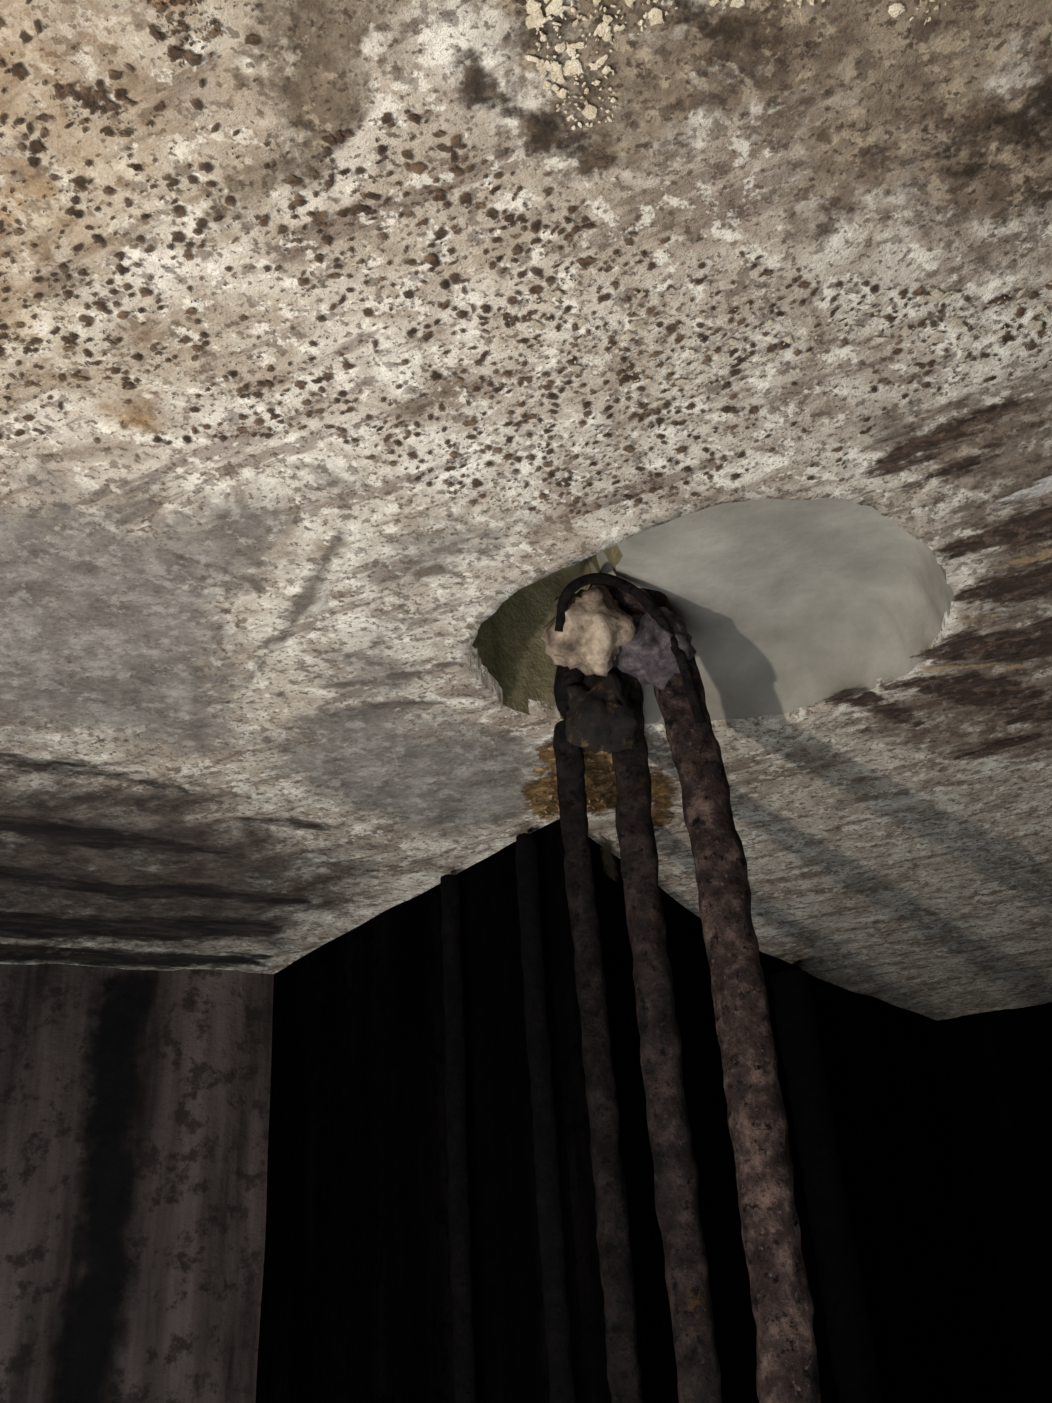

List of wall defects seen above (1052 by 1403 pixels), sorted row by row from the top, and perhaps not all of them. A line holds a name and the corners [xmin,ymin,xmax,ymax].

water stain [0,0,1052,761]
peeling [862,398,1018,491]
spalling [472,498,1052,760]
water stain [0,753,187,791]
water stain [0,815,246,858]
water stain [237,818,328,831]
water stain [266,654,545,837]
rust [521,738,560,819]
rust [583,748,617,815]
rust [649,766,677,831]